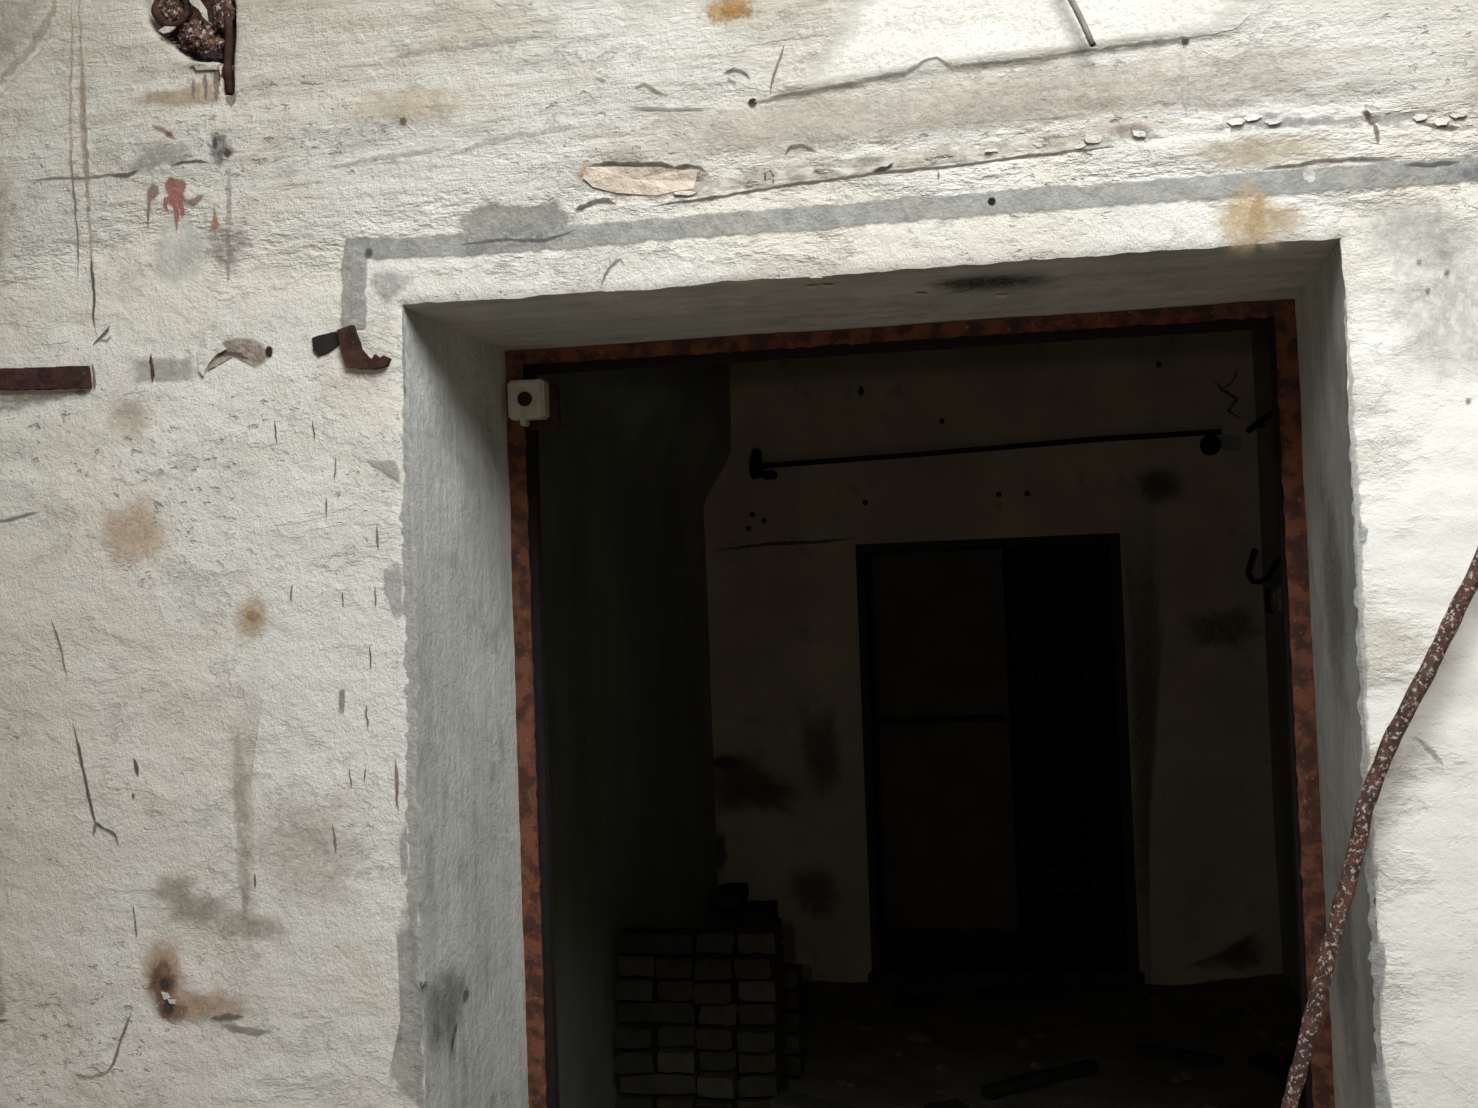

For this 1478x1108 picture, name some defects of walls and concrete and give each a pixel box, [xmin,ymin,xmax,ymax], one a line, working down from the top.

rust [708,0,753,22]
rust [147,70,236,106]
rust [1226,194,1280,242]
rust [0,364,96,401]
crack [72,722,119,846]
rust [147,947,271,1035]